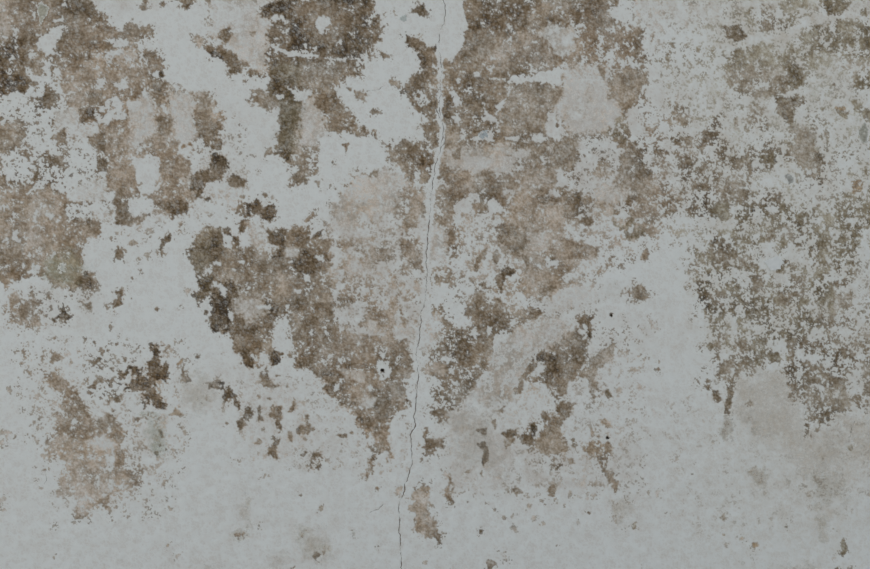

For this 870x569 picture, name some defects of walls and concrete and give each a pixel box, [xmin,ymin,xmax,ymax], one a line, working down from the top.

peeling [400,0,432,22]
peeling [354,90,381,117]
peeling [109,232,141,263]
peeling [144,231,175,261]
peeling [638,241,653,263]
peeling [1,286,74,337]
peeling [109,287,128,309]
crack [377,0,446,569]
peeling [615,278,658,305]
peeling [21,336,193,525]
peeling [284,397,345,473]
peeling [421,427,447,457]